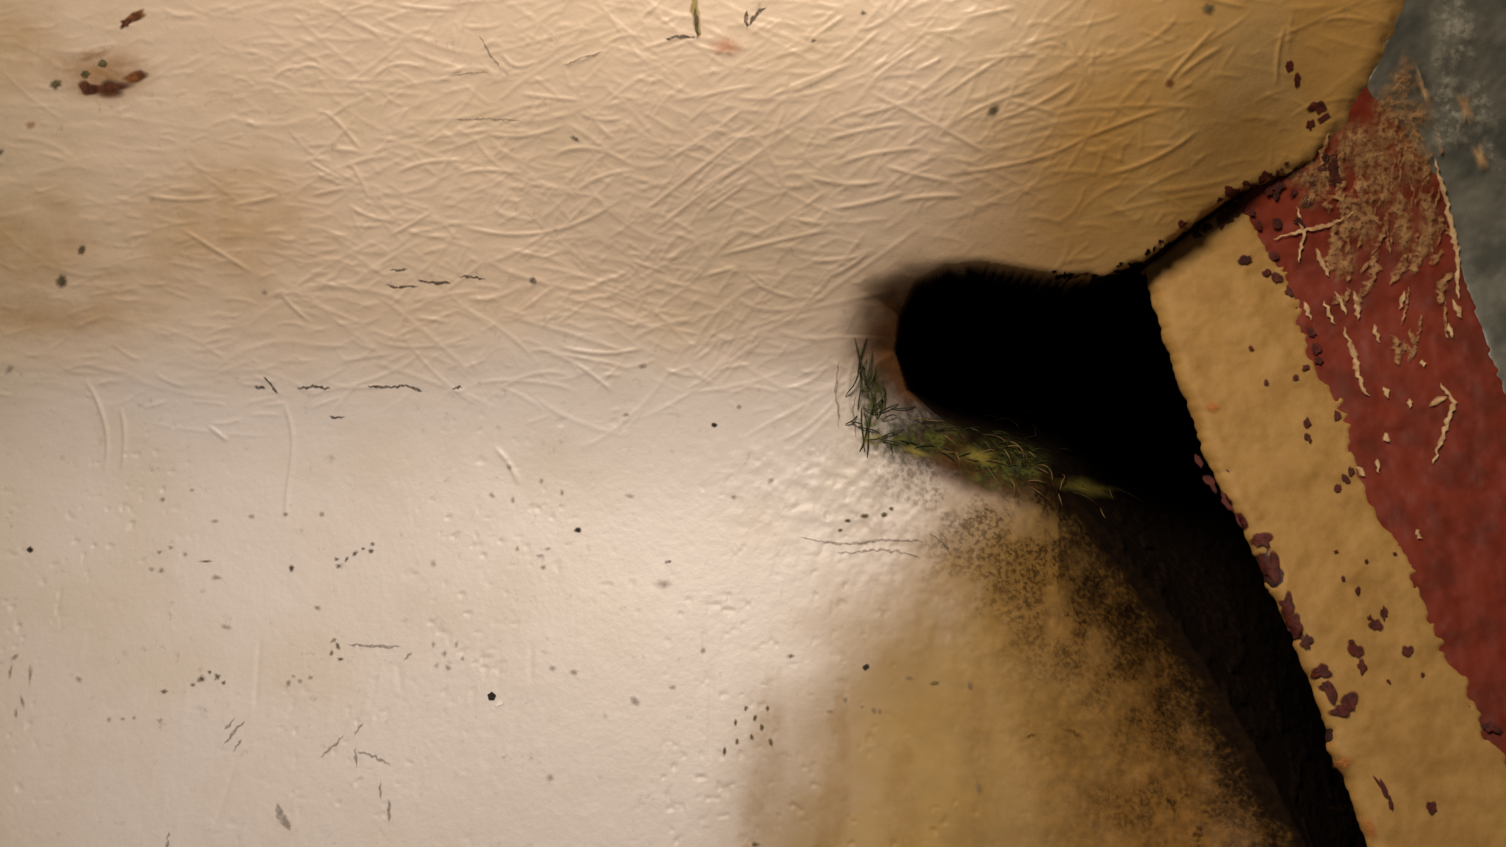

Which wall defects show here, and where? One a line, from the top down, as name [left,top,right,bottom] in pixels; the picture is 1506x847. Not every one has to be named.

rust [121,10,144,28]
rust [79,60,146,96]
peeling [1306,101,1331,130]
peeling [1178,153,1345,239]
peeling [1238,251,1293,296]
peeling [1334,466,1355,492]
peeling [1194,454,1313,649]
peeling [1367,606,1388,630]
damp [778,484,1290,847]
peeling [1347,639,1367,675]
peeling [1310,663,1358,717]
peeling [1373,776,1393,810]